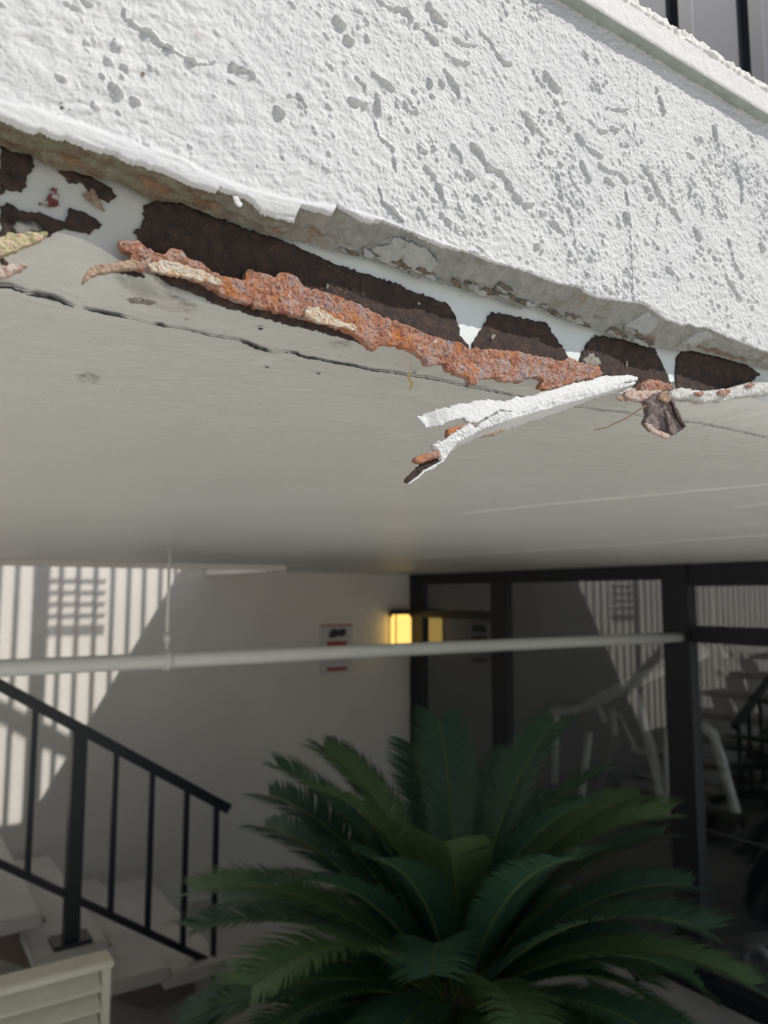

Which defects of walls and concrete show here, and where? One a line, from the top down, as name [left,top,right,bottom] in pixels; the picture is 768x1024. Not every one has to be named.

peeling [126,297,158,305]
crack [0,286,520,397]
rust [81,200,760,391]
spalling [338,234,528,306]
peeling [547,308,591,328]
spalling [605,312,659,347]
peeling [669,381,768,405]
peeling [403,375,638,484]